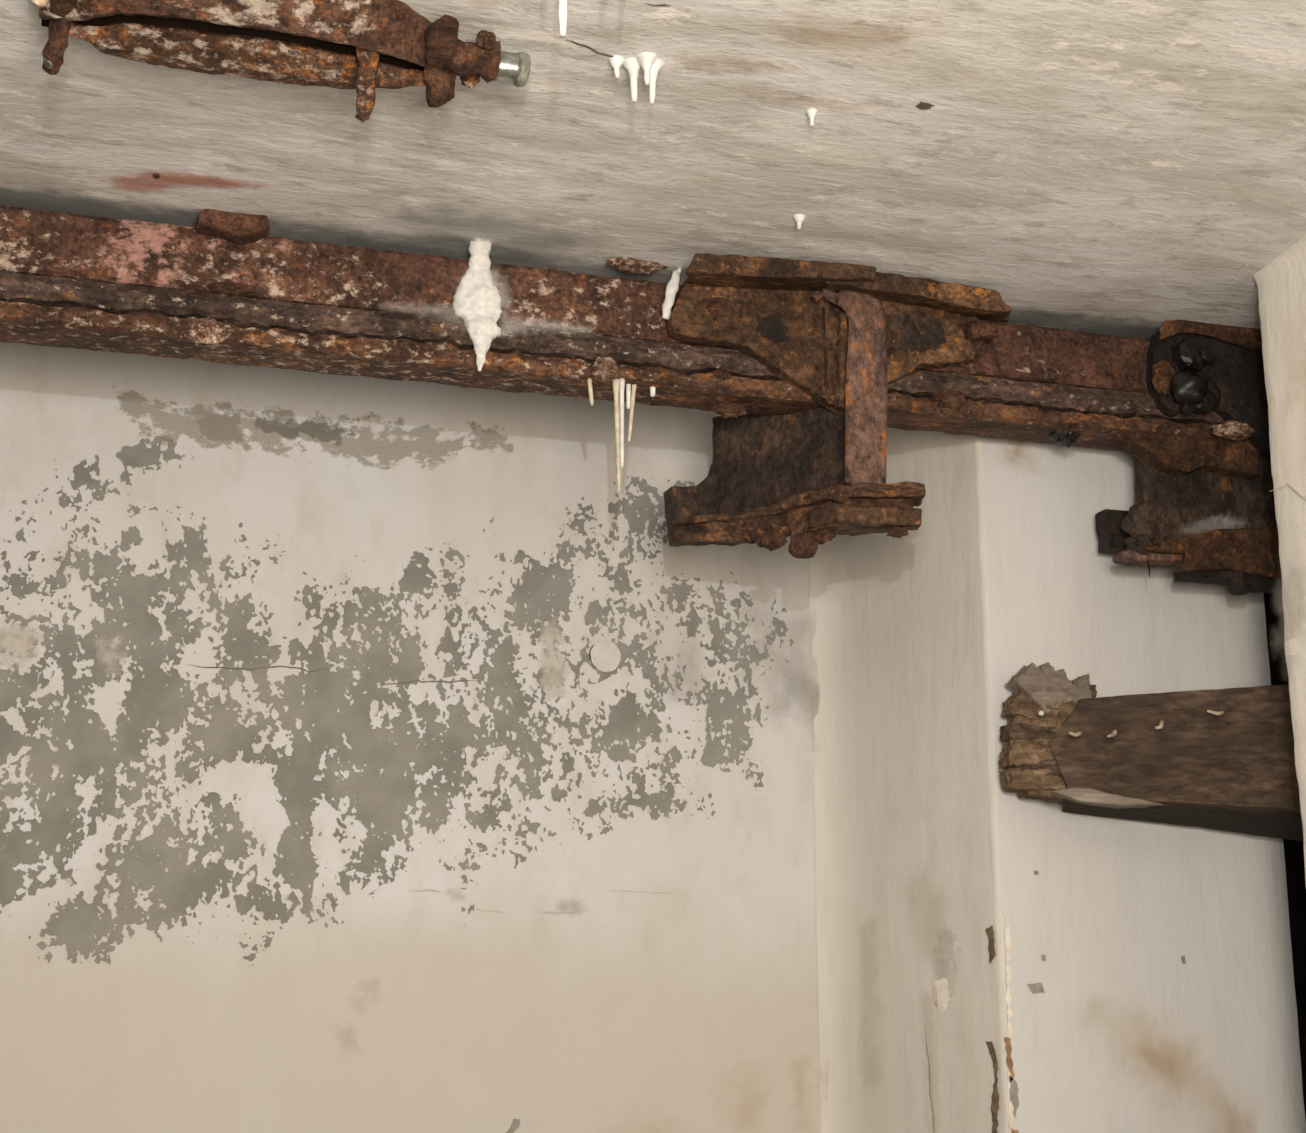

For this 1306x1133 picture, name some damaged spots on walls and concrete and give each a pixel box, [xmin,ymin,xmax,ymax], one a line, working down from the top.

peeling [0,435,794,967]
spalling [985,916,1019,1133]
spalling [1028,982,1045,994]